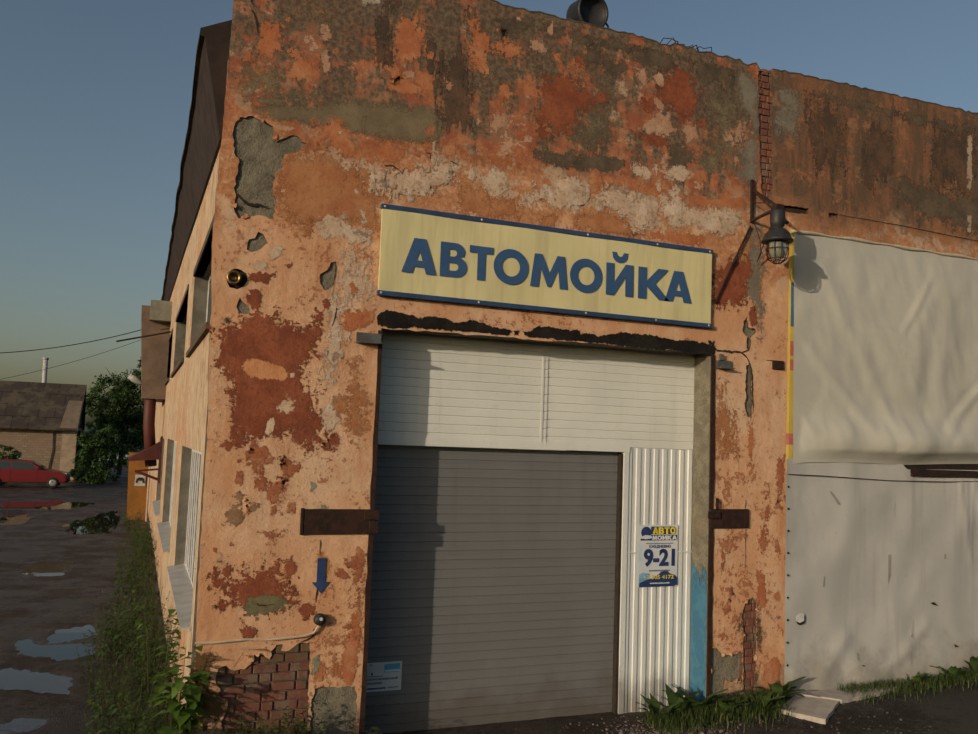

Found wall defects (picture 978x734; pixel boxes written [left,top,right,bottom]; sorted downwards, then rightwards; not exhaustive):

leakage [232,0,476,144]
peeling [232,115,550,239]
leakage [495,10,760,189]
peeling [573,211,707,247]
leakage [772,85,978,239]
peeling [206,232,376,527]
peeling [193,541,315,638]
flaking render [216,546,367,734]
flaking render [711,454,786,700]